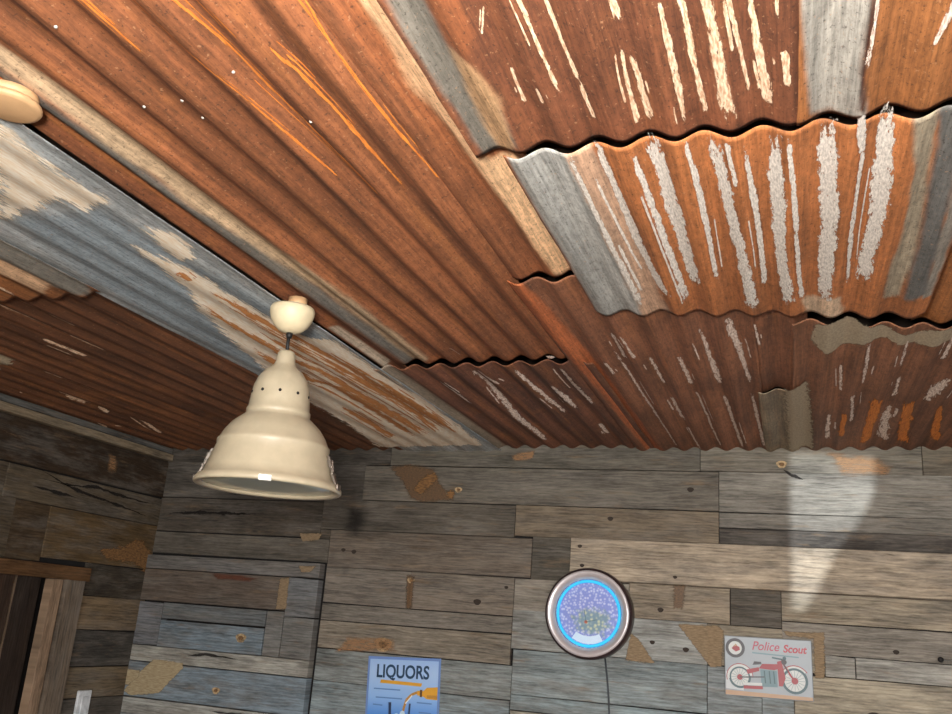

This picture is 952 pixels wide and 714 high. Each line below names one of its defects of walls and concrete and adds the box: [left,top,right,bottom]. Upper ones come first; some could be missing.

rust [132,0,380,196]
rust [270,41,402,185]
rust [298,0,439,178]
peeling [615,50,653,123]
peeling [677,0,791,121]
peeling [570,133,701,305]
peeling [685,135,805,309]
peeling [816,101,896,301]
peeling [130,225,482,448]
rust [202,292,456,438]
rust [782,382,814,450]
rust [811,316,952,354]